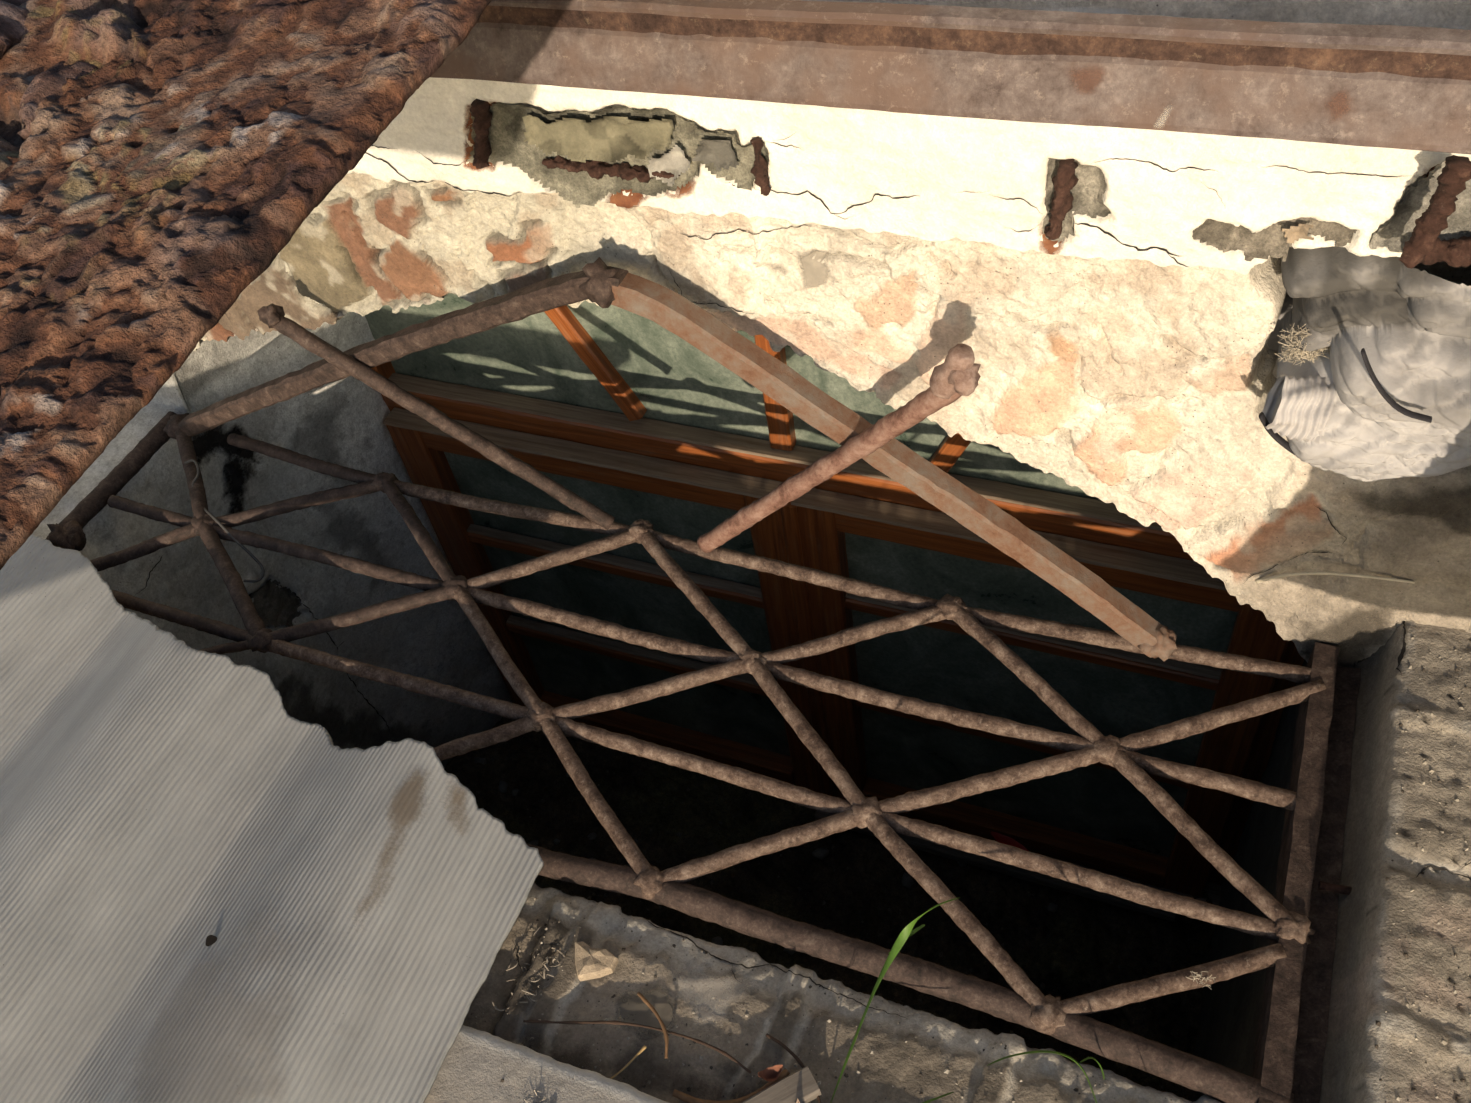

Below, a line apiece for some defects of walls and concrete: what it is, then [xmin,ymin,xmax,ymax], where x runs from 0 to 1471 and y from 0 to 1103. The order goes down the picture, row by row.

crack [366,145,547,197]
rust [464,102,501,171]
spalling [467,98,771,208]
crack [682,182,916,240]
rust [1040,232,1062,255]
crack [957,191,1187,267]
spalling [1192,155,1471,269]